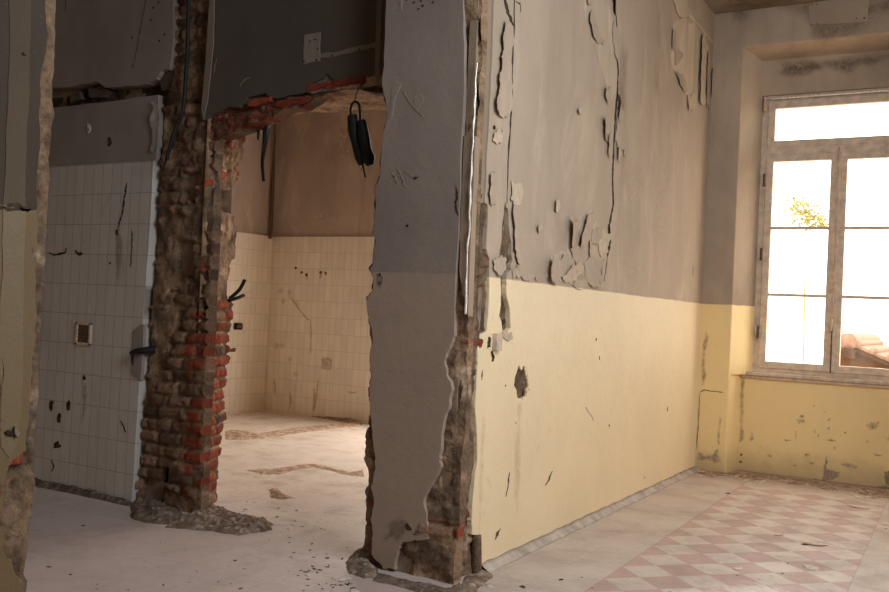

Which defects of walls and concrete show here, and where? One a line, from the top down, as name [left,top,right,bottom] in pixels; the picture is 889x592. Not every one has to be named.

spalling [0,0,130,592]
flaking render [135,0,387,513]
spalling [401,0,612,585]
peeling [584,0,620,105]
crack [604,60,621,280]
peeling [605,104,630,164]
peeling [670,0,714,111]
spalling [359,415,392,571]